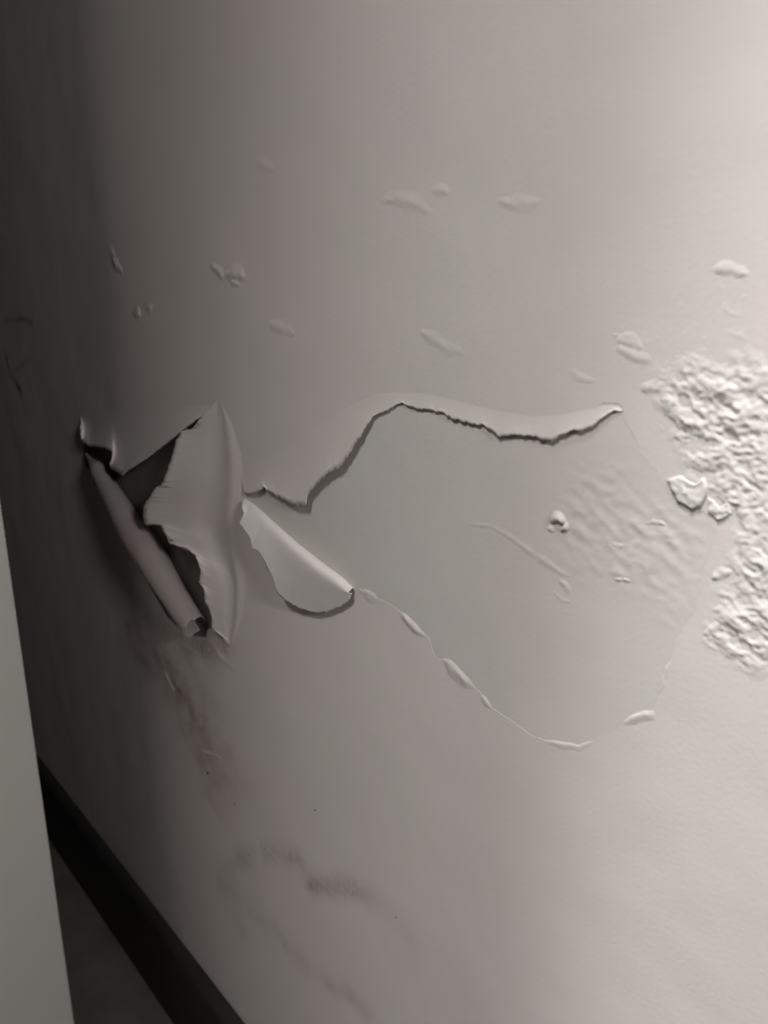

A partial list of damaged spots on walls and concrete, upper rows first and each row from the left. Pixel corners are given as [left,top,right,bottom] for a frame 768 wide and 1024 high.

peeling [79,392,717,752]